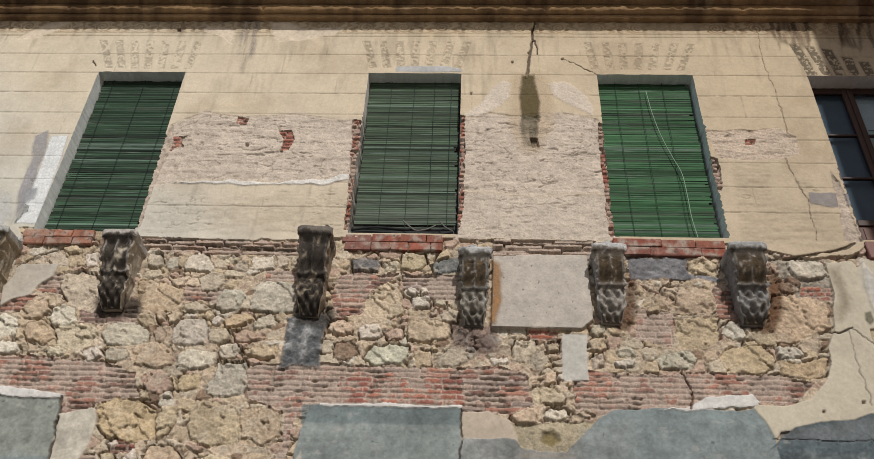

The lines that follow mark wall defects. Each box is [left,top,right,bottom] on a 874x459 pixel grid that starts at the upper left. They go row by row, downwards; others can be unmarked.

flaking render [138,111,362,231]
damp [520,75,540,146]
crack [526,23,538,78]
flaking render [456,81,619,242]
flaking render [706,127,801,192]
crack [754,25,789,134]
crack [768,158,856,262]
crack [829,327,874,406]